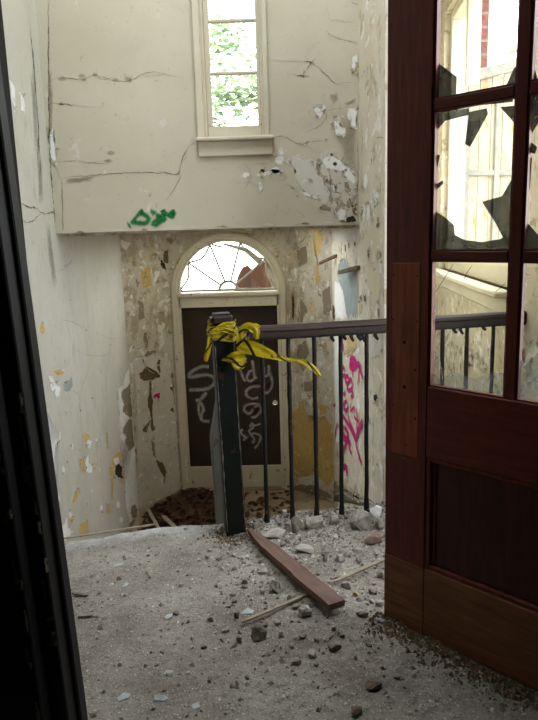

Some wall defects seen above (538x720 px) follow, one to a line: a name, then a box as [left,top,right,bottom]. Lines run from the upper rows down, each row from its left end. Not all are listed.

crack [21,0,197,223]
flaking render [160,248,170,270]
peeling [241,104,383,324]
peeling [62,486,90,541]
peeling [78,330,182,527]
peeling [292,335,374,506]
peeling [369,333,382,367]